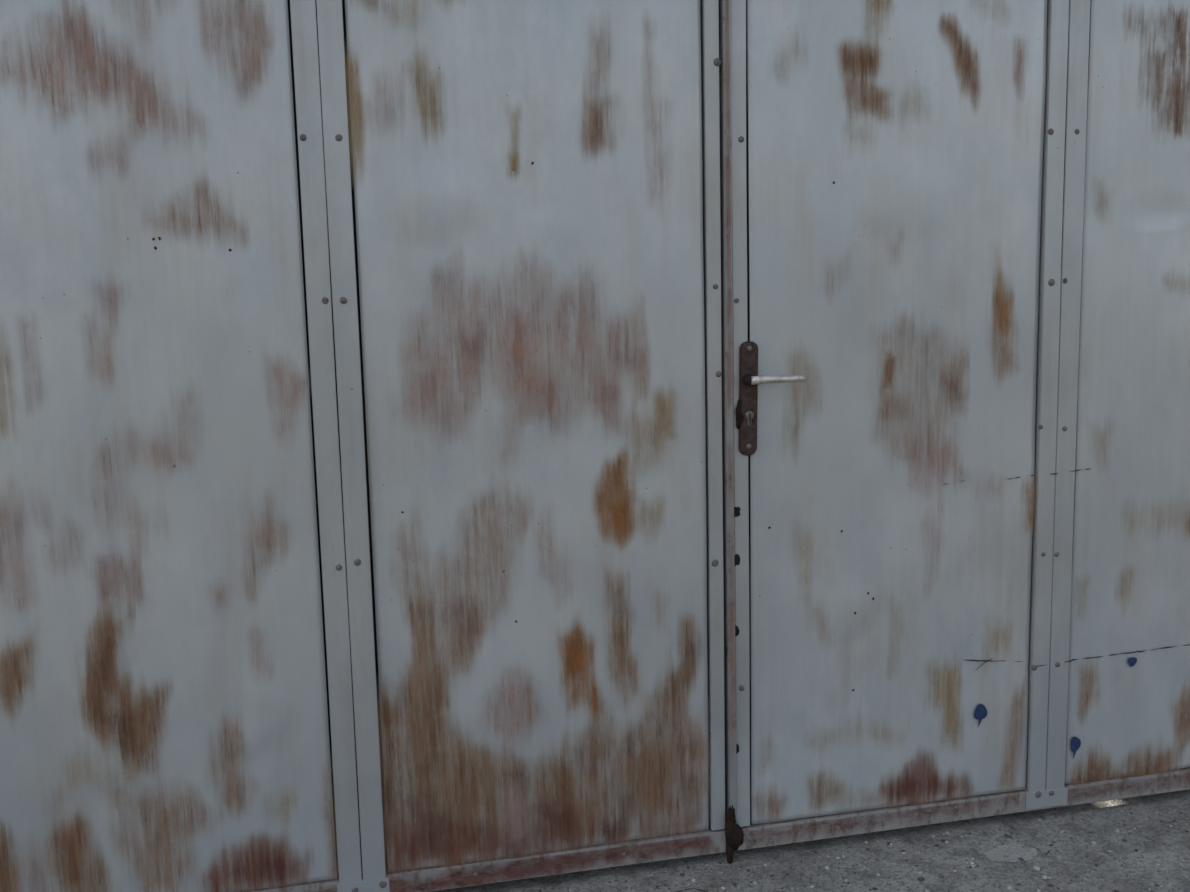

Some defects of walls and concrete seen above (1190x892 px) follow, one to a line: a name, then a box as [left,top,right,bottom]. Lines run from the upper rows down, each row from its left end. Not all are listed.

rust [8,18,164,126]
rust [843,47,882,109]
rust [943,23,978,98]
rust [1148,14,1190,133]
rust [411,276,637,421]
rust [596,457,632,544]
rust [83,613,165,769]
rust [382,506,711,892]
rust [1071,696,1190,798]
rust [54,817,107,892]
rust [203,840,302,892]